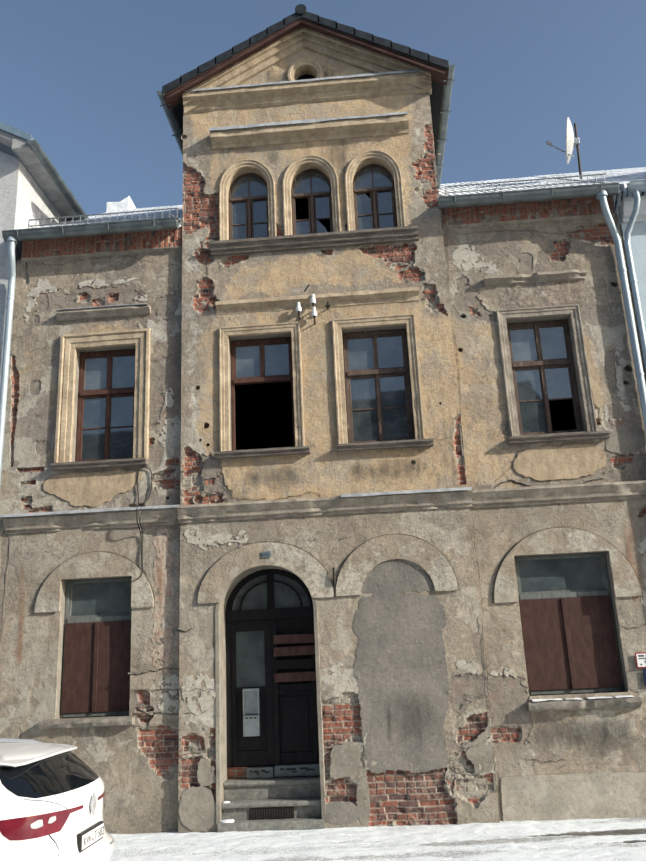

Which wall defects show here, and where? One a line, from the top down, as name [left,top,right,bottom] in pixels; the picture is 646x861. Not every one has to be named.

flaking render [181,163,249,268]
flaking render [548,221,620,262]
peeling [76,276,138,304]
peeling [134,290,182,341]
flaking render [193,277,220,314]
flaking render [358,242,501,322]
flaking render [10,353,53,513]
flaking render [149,357,233,505]
flaking render [453,414,467,485]
crack [491,479,532,489]
peeling [130,526,250,802]
flaking render [320,659,533,827]